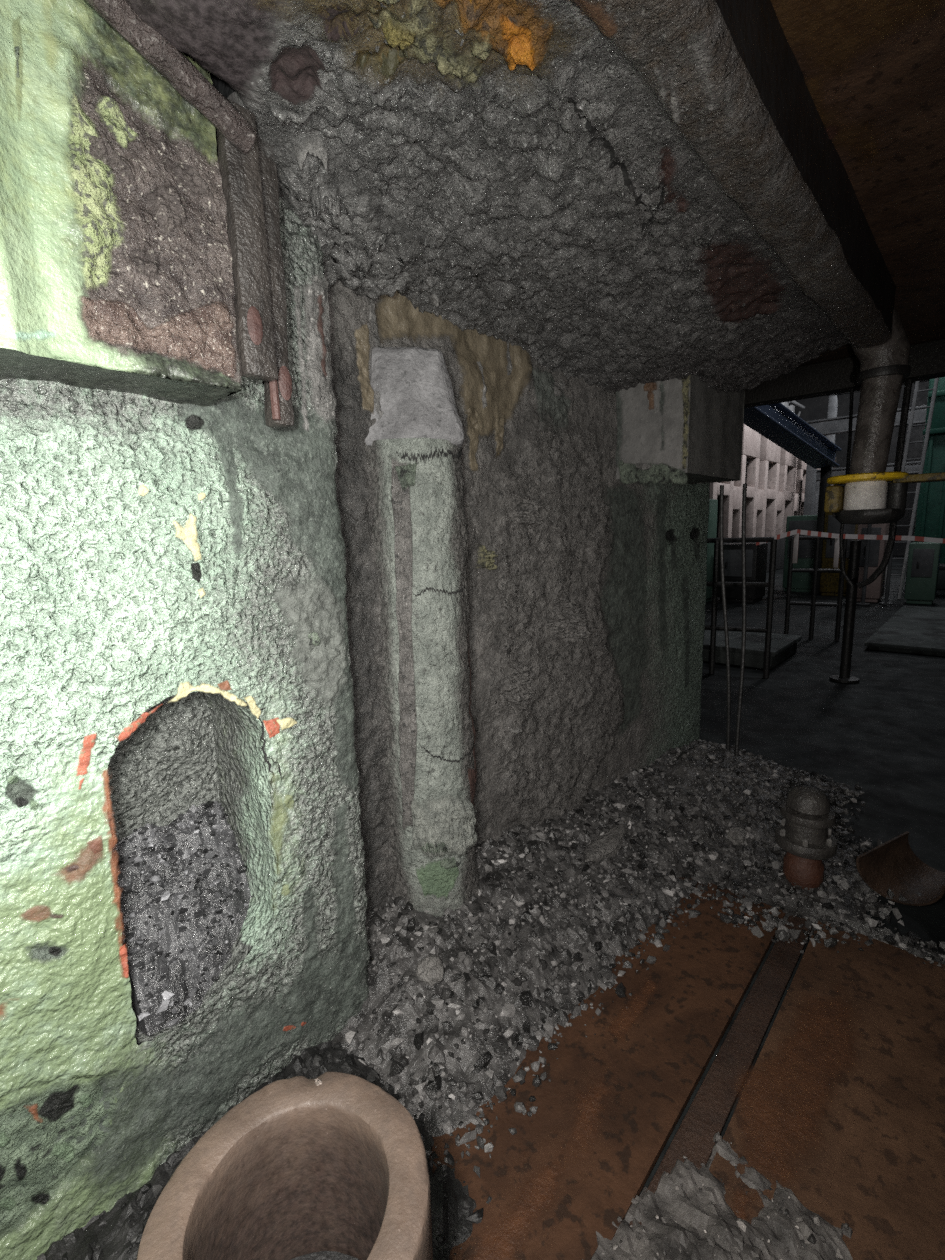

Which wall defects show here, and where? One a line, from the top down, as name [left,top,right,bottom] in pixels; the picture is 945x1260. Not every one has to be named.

spalling [270,45,325,125]
spalling [356,44,408,106]
spalling [69,57,240,382]
corrosion [247,306,263,345]
peeling [173,514,205,598]
peeling [118,708,157,741]
peeling [172,681,297,738]
spalling [0,1083,114,1235]